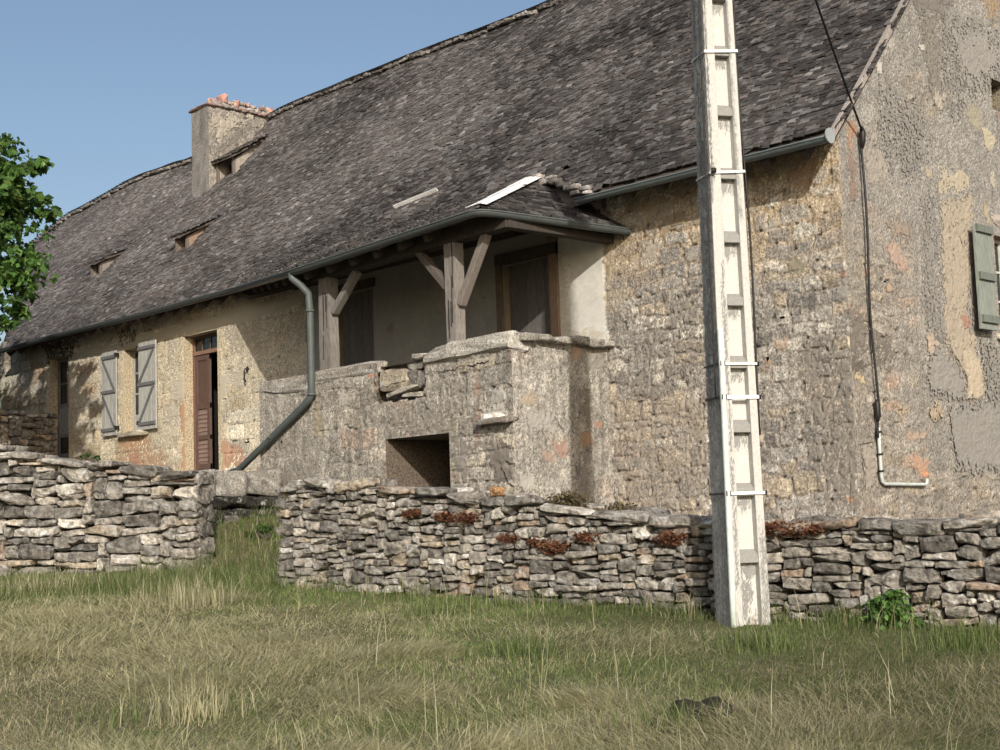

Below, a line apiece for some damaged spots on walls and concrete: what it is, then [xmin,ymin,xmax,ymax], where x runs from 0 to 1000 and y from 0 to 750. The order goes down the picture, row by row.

peeling [965,99,996,152]
peeling [924,164,992,404]